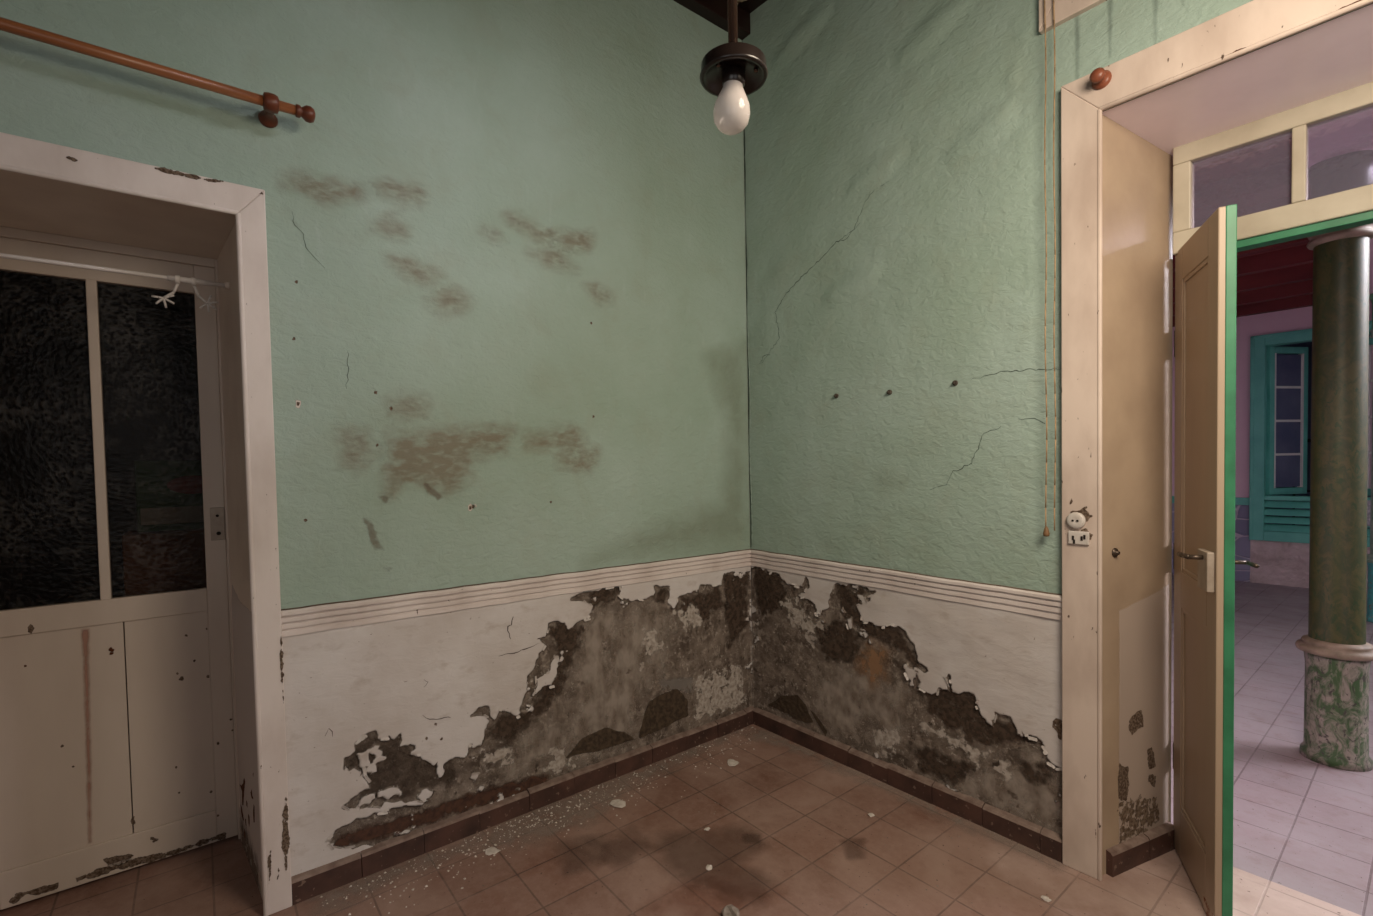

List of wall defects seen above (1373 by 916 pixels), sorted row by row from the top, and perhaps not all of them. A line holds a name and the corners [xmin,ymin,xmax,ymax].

crack [741,130,749,209]
crack [746,181,889,543]
crack [935,418,1045,488]
flaking render [325,566,1062,850]
peeling [1129,710,1143,735]
peeling [240,773,255,838]
peeling [1117,747,1159,844]
peeling [76,815,226,882]
peeling [9,883,59,904]